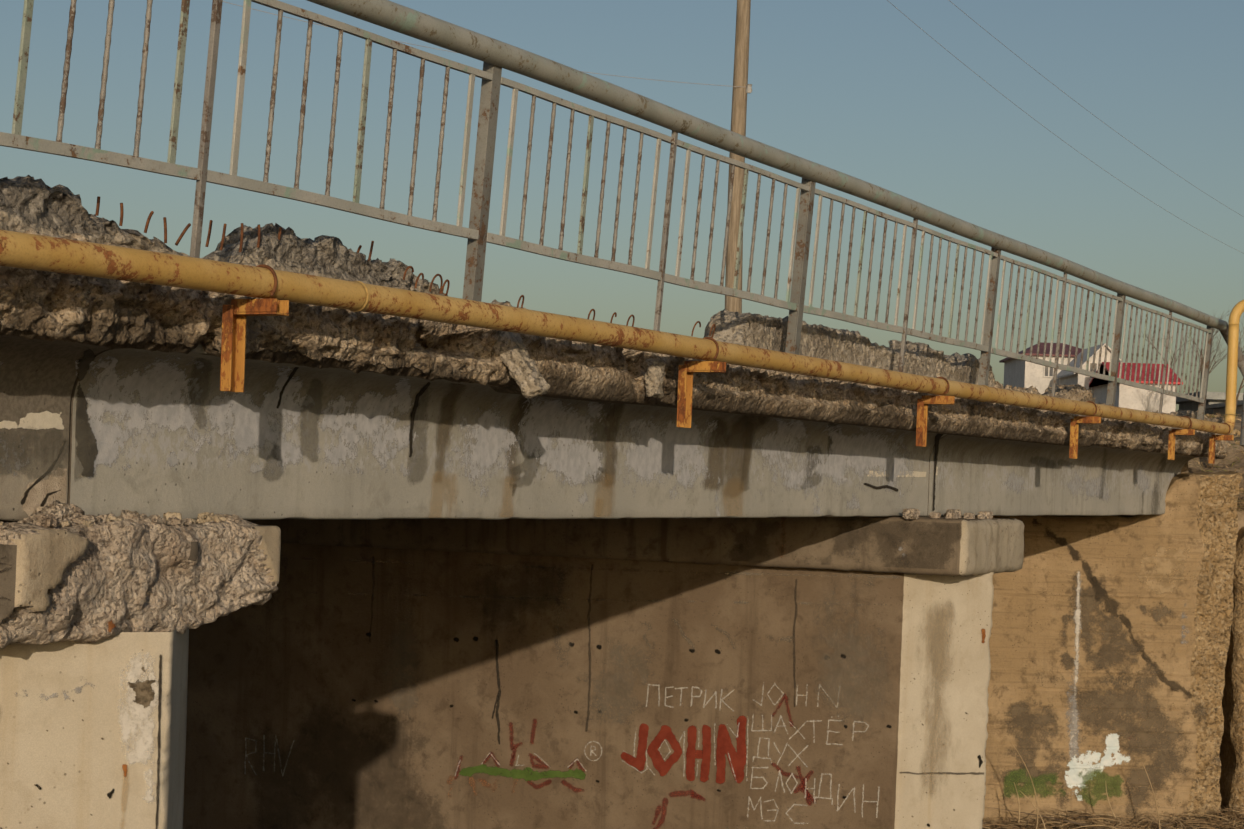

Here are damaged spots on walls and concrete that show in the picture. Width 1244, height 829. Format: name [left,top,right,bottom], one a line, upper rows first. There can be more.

peeling [75,355,421,479]
crack [277,367,299,408]
damp [437,383,463,481]
damp [509,396,530,493]
damp [605,403,623,486]
damp [705,415,765,496]
spalling [128,667,155,708]
crack [492,640,501,744]